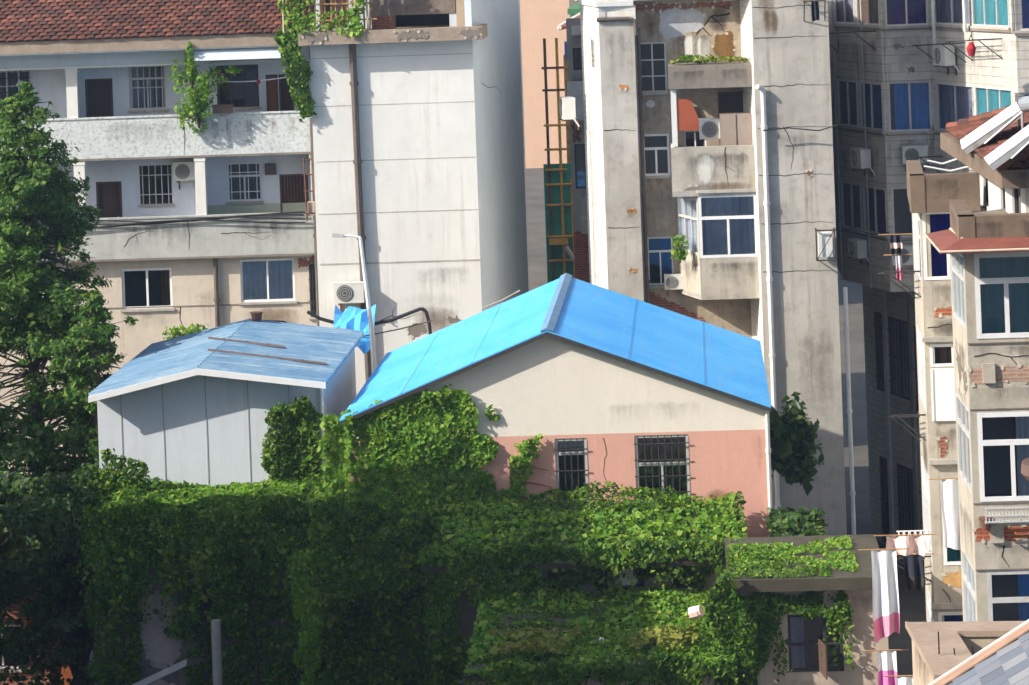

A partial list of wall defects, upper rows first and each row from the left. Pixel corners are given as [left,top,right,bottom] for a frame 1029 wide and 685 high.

flaking render [933,307,952,318]
crack [927,324,1029,407]
flaking render [956,350,1029,395]
flaking render [973,528,991,544]
flaking render [1004,523,1029,543]